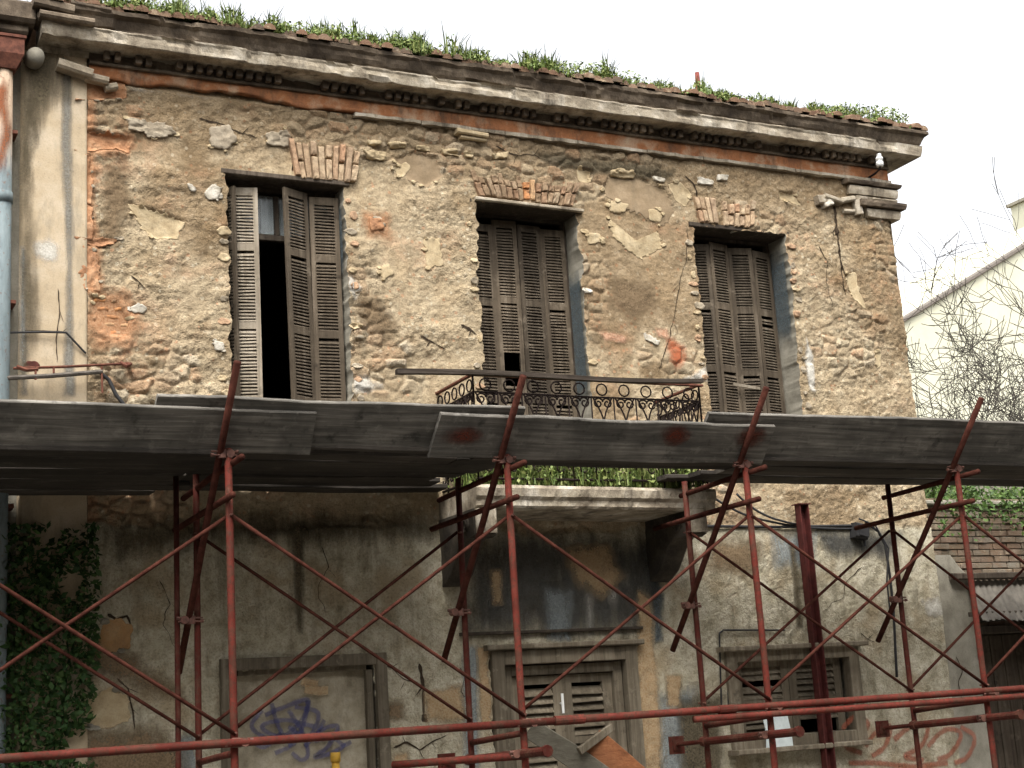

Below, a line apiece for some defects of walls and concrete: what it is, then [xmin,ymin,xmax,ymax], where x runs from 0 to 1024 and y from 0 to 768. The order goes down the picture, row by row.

damp [21,40,75,395]
spalling [74,81,185,348]
spalling [207,124,238,153]
spalling [216,226,232,262]
spalling [339,198,389,296]
spalling [363,141,474,188]
peeling [569,278,598,393]
spalling [577,165,729,260]
spalling [685,239,705,342]
peeling [771,243,802,334]
flaking render [845,271,866,310]
damp [468,536,663,642]